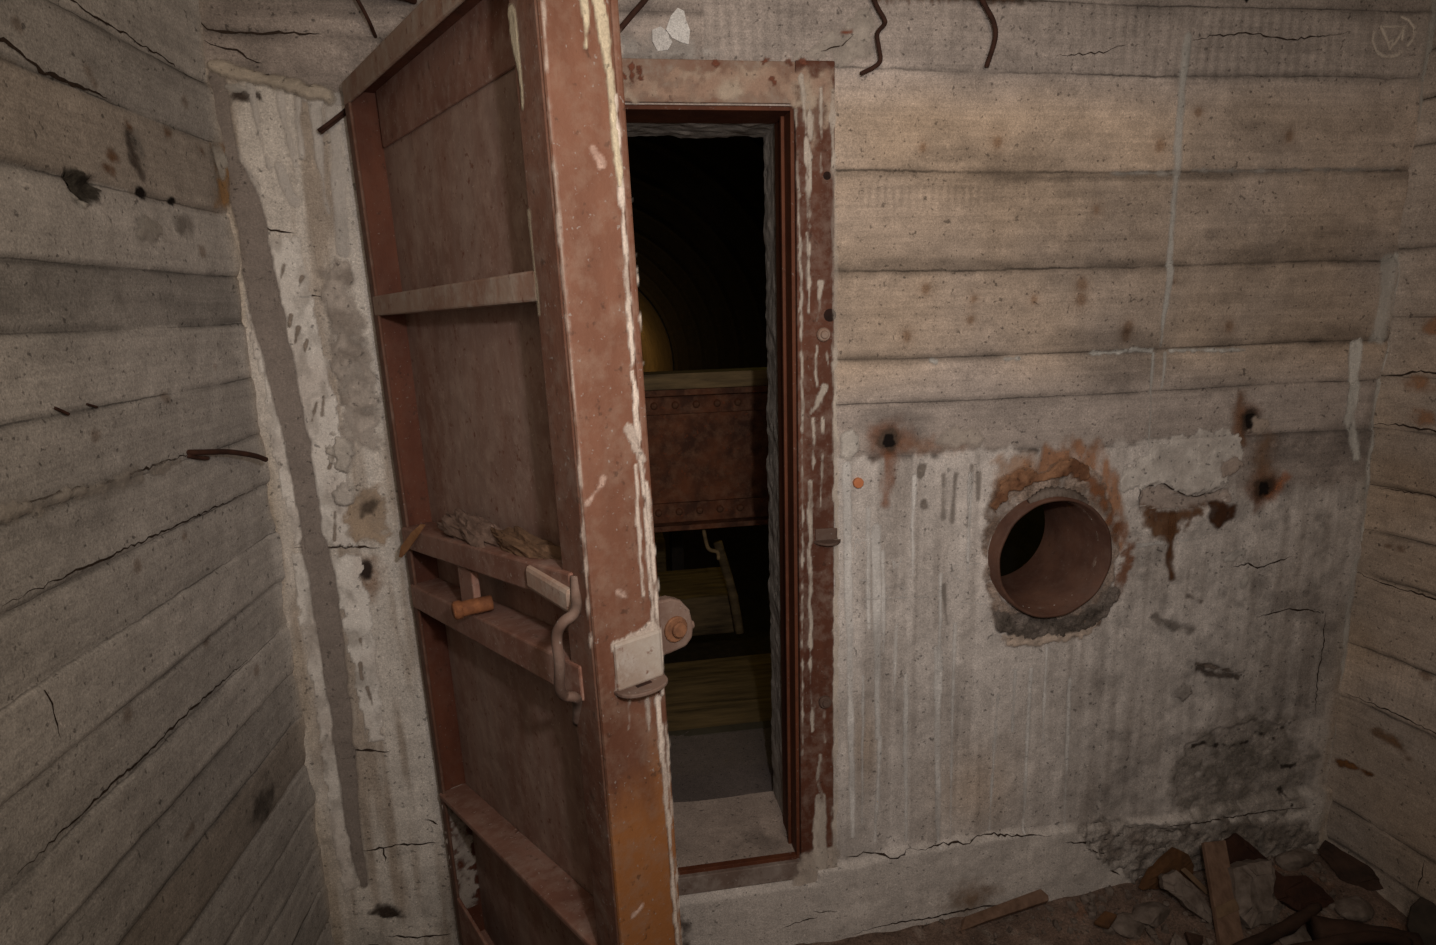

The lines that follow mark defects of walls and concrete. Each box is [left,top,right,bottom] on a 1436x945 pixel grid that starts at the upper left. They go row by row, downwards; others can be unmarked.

crack [0,37,106,98]
crack [71,0,196,80]
rust [623,62,643,80]
rust [762,58,808,85]
rust [878,428,898,451]
rust [1235,396,1284,498]
crack [3,493,245,606]
spalling [982,427,1244,647]
crack [19,657,250,872]
crack [1153,807,1308,828]
crack [848,832,1120,874]